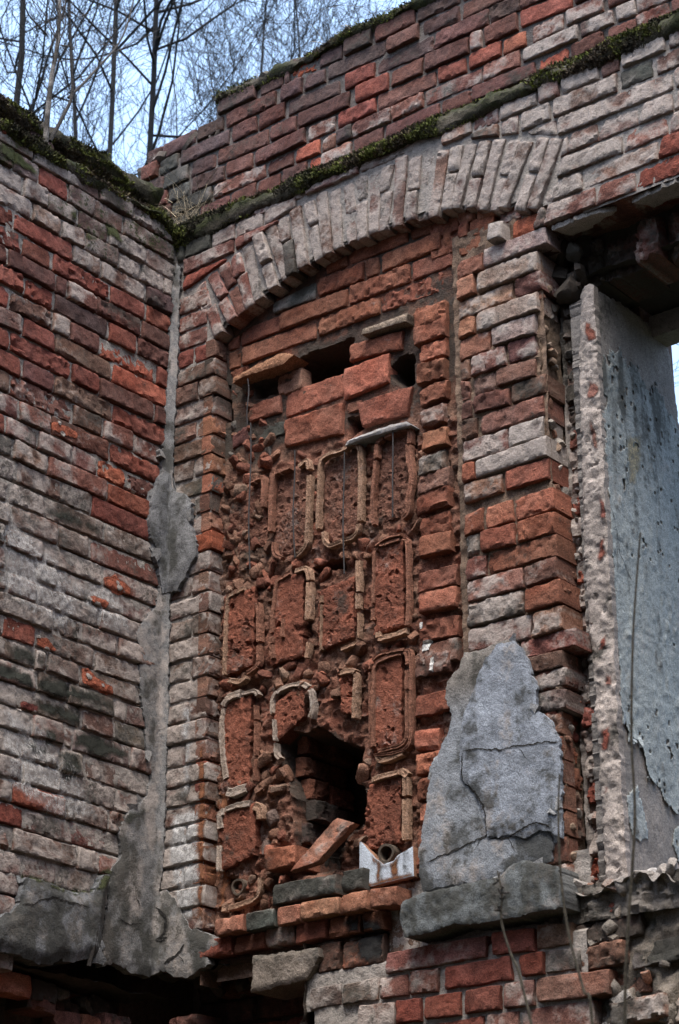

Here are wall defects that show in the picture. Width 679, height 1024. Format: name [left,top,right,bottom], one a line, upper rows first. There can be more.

spalling [585,322,596,340]
peeling [0,263,219,980]
crack [427,741,584,862]
peeling [587,347,679,863]